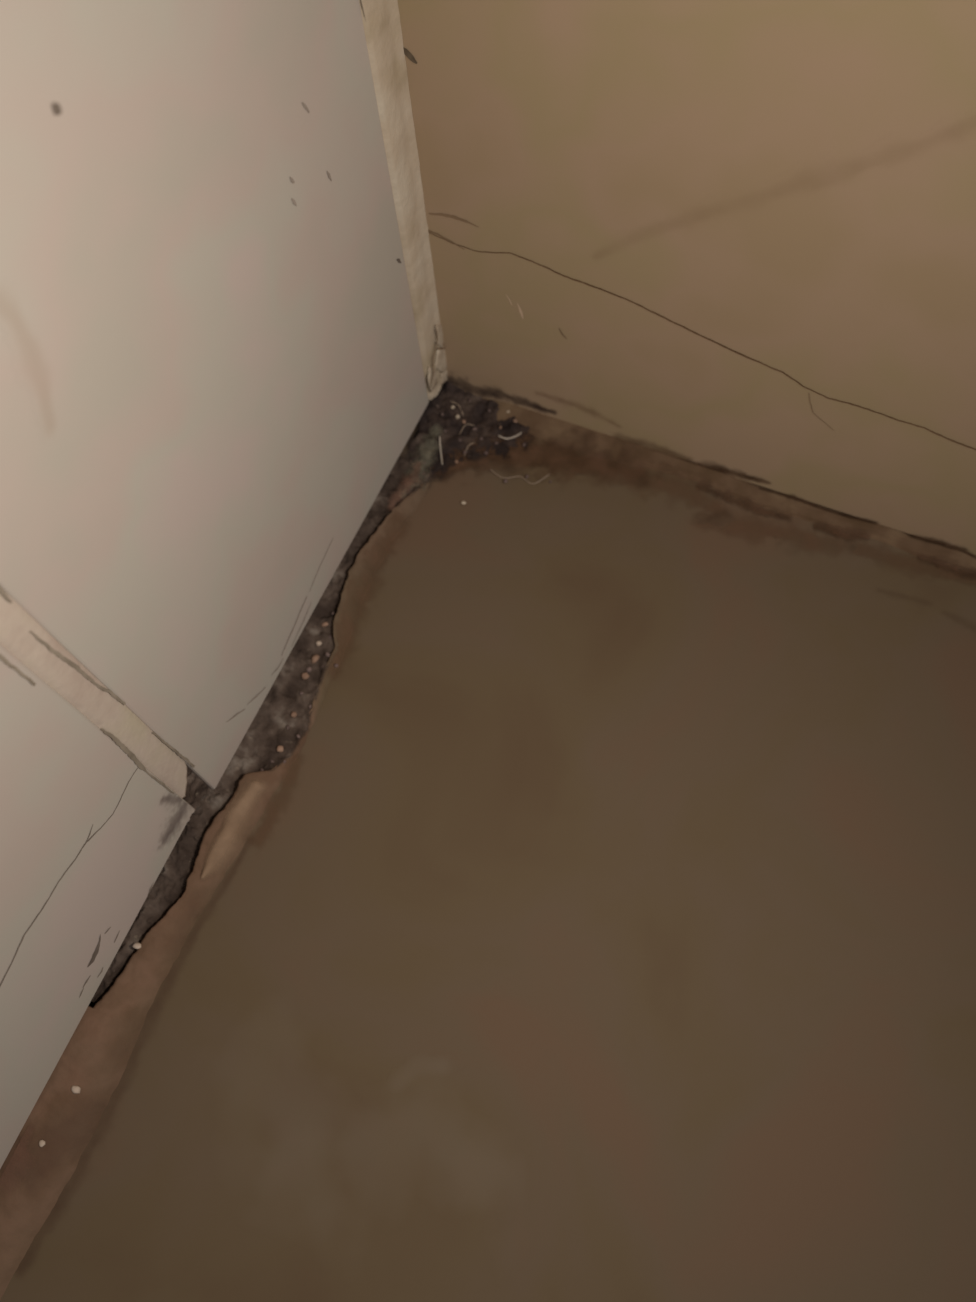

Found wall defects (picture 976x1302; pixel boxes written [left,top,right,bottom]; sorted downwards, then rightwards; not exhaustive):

crack [428,213,976,450]
leakage [152,790,195,859]